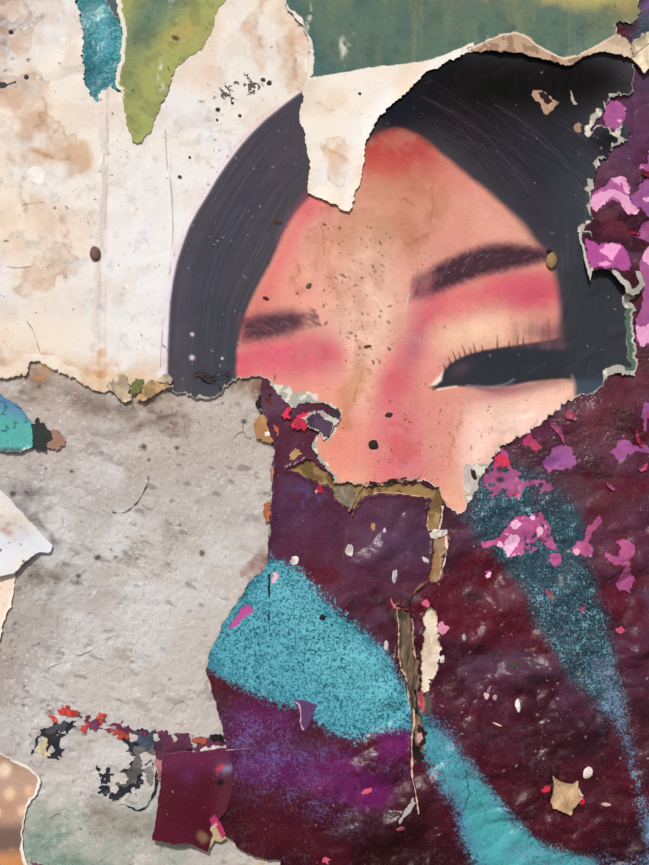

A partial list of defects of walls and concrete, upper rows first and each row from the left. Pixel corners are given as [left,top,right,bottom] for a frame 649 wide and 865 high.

peeling [603,100,626,130]
peeling [281,407,341,440]
peeling [0,361,280,865]
peeling [420,599,449,693]